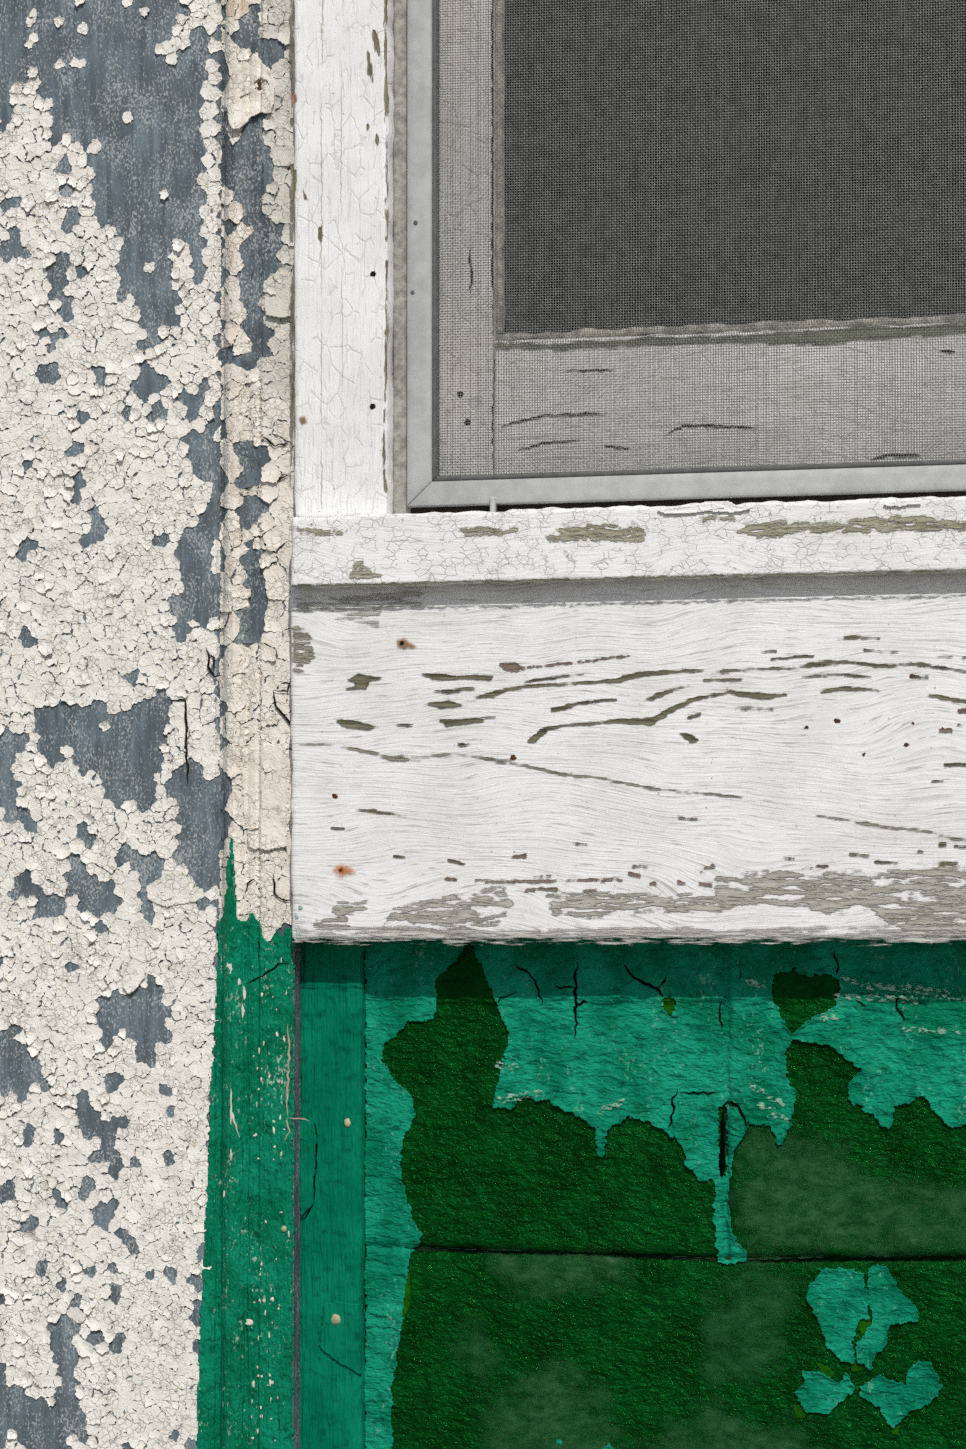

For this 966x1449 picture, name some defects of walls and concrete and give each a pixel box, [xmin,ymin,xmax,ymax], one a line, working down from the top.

peeling [0,0,424,674]
peeling [658,501,750,514]
peeling [0,668,290,1117]
crack [494,963,588,1037]
crack [624,964,666,997]
peeling [0,1012,141,1255]
spalling [162,1150,175,1166]
peeling [319,937,966,1449]
crack [668,1089,747,1176]
peeling [0,1259,126,1449]
spalling [146,1243,205,1353]
peeling [245,1258,280,1341]